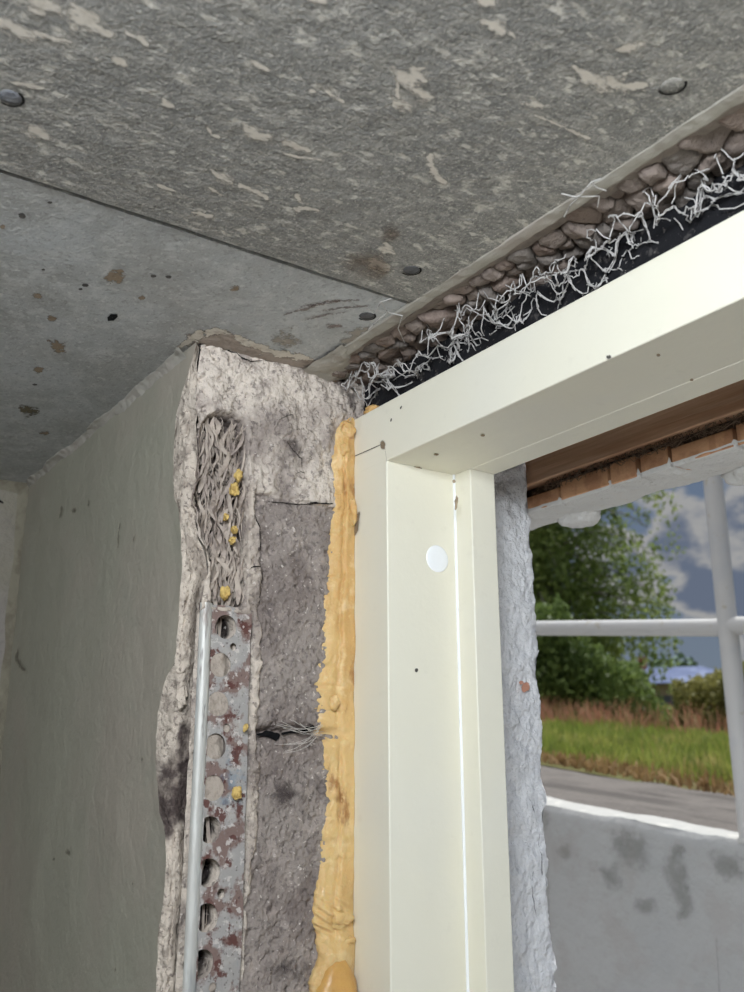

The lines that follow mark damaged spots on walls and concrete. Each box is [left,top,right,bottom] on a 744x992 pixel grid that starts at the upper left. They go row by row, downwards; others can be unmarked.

flaking render [155,343,208,992]